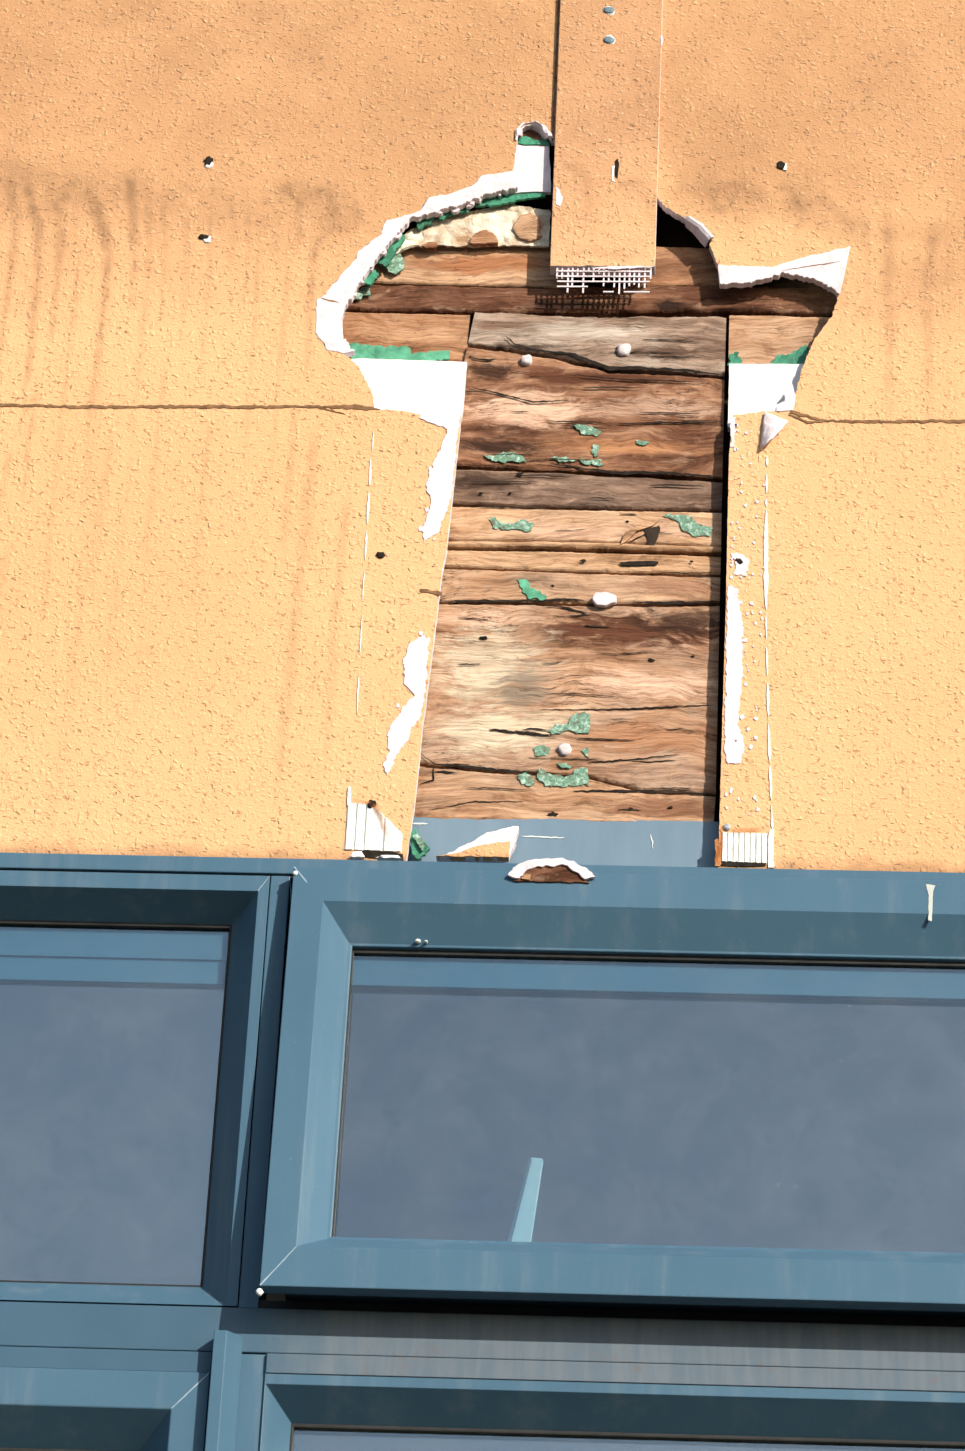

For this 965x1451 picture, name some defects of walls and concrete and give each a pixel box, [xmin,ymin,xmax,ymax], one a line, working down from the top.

flaking render [315,121,563,361]
flaking render [717,246,850,297]
peeling [770,345,810,364]
crack [0,403,381,414]
peeling [418,412,460,542]
peeling [484,452,527,463]
flaking render [730,384,796,465]
crack [789,410,965,424]
peeling [383,631,430,774]
peeling [721,477,774,868]
peeling [517,711,591,788]
flaking render [344,786,403,861]